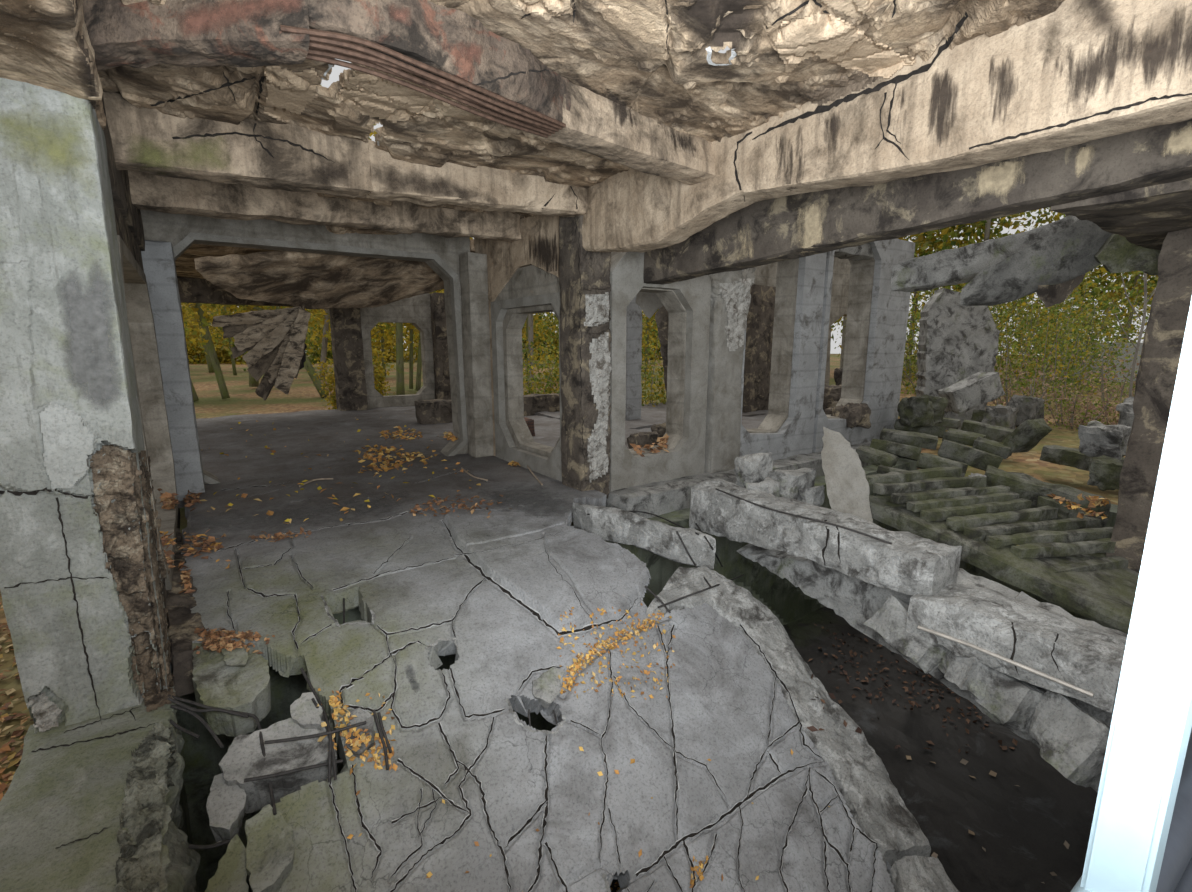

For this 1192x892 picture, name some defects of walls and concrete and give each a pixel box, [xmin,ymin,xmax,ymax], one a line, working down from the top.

flaking render [510,0,573,16]
crack [766,0,829,29]
flaking render [775,0,916,106]
crack [733,12,968,202]
leakage [930,72,957,143]
leakage [989,59,1013,120]
crack [969,93,1192,150]
leakage [1056,0,1192,98]
spalling [584,292,612,482]
crack [0,487,158,752]
spalling [39,402,392,892]
crack [216,506,878,892]